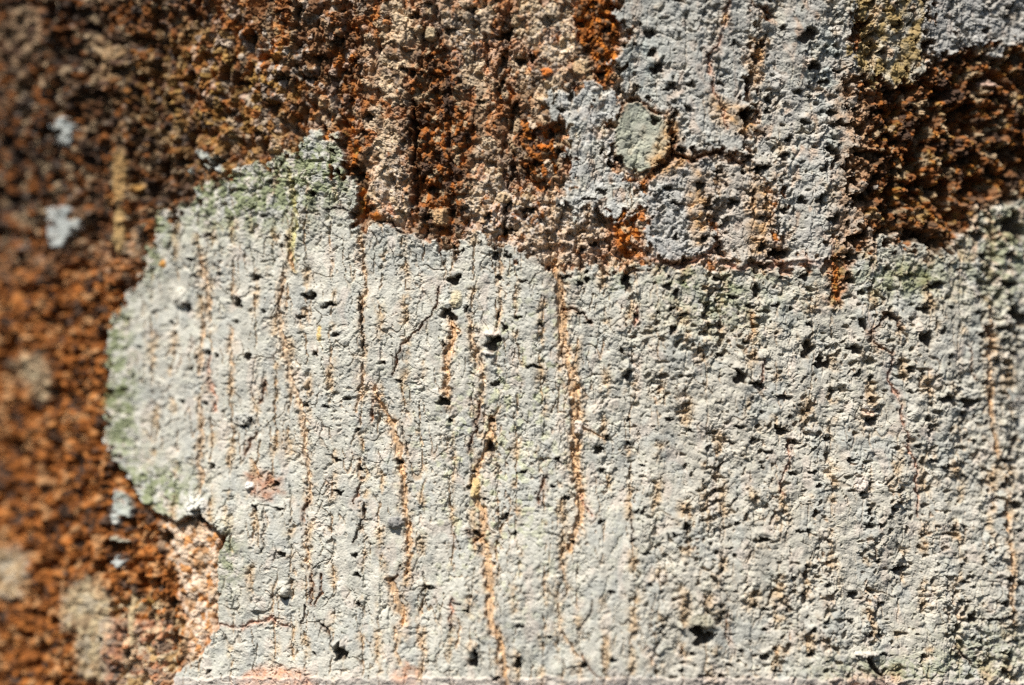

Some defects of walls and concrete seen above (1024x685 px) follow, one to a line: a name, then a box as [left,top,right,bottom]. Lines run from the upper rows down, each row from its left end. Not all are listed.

peeling [0,6,167,104]
corrosion [573,0,622,81]
corrosion [405,36,481,247]
corrosion [516,114,567,197]
corrosion [550,206,652,266]
peeling [10,354,62,402]
crack [192,158,521,685]
crack [536,177,605,680]
crack [868,312,921,518]
peeling [0,546,28,602]
peeling [58,518,222,685]
crack [863,657,886,680]